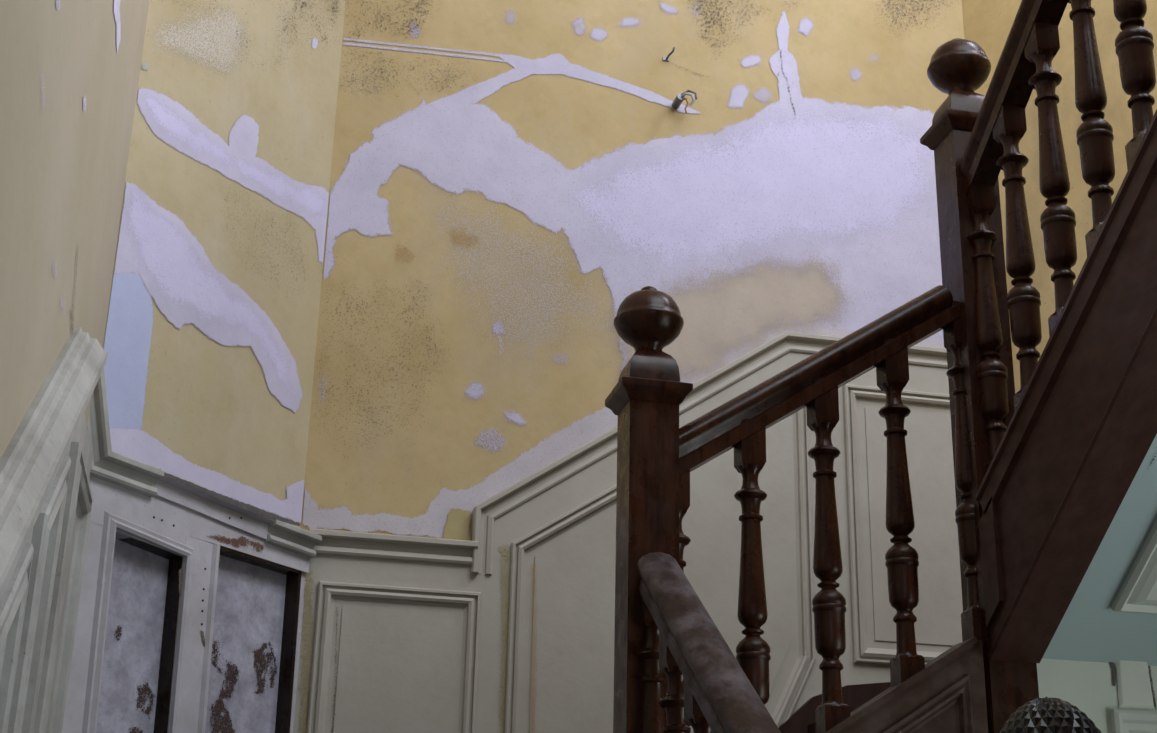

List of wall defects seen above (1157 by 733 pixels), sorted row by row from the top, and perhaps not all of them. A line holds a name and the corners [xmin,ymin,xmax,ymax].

leakage [159,0,478,98]
leakage [684,0,810,60]
peeling [599,243,857,391]
corrosion [209,535,263,552]